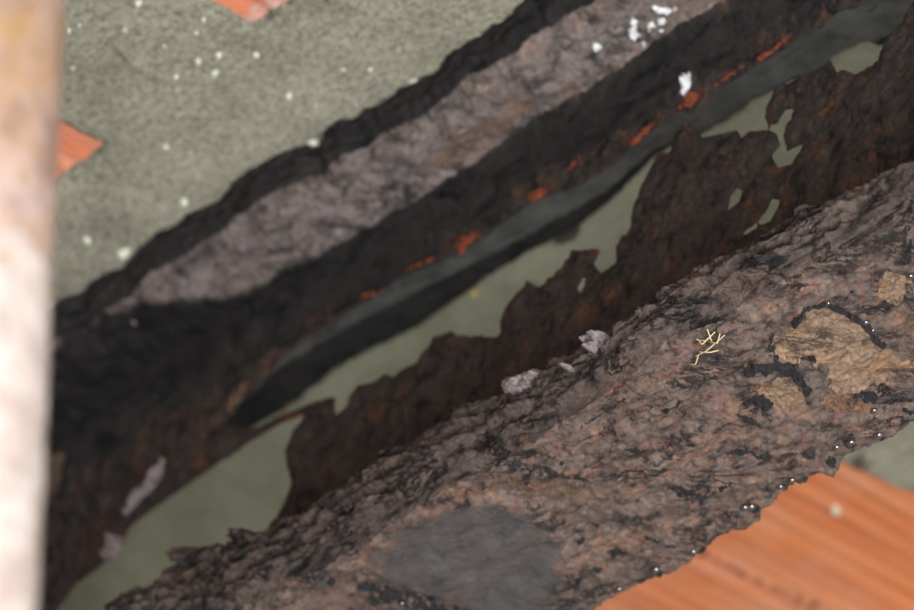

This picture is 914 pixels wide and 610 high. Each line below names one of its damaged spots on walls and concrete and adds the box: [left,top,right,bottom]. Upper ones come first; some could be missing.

rust [757,35,789,61]
rust [678,71,702,110]
rust [630,112,660,145]
rust [526,186,548,204]
spalling [118,248,131,259]
rust [453,230,482,257]
rust [874,271,912,306]
rust [44,260,316,444]
rust [579,330,609,353]
rust [742,302,914,413]